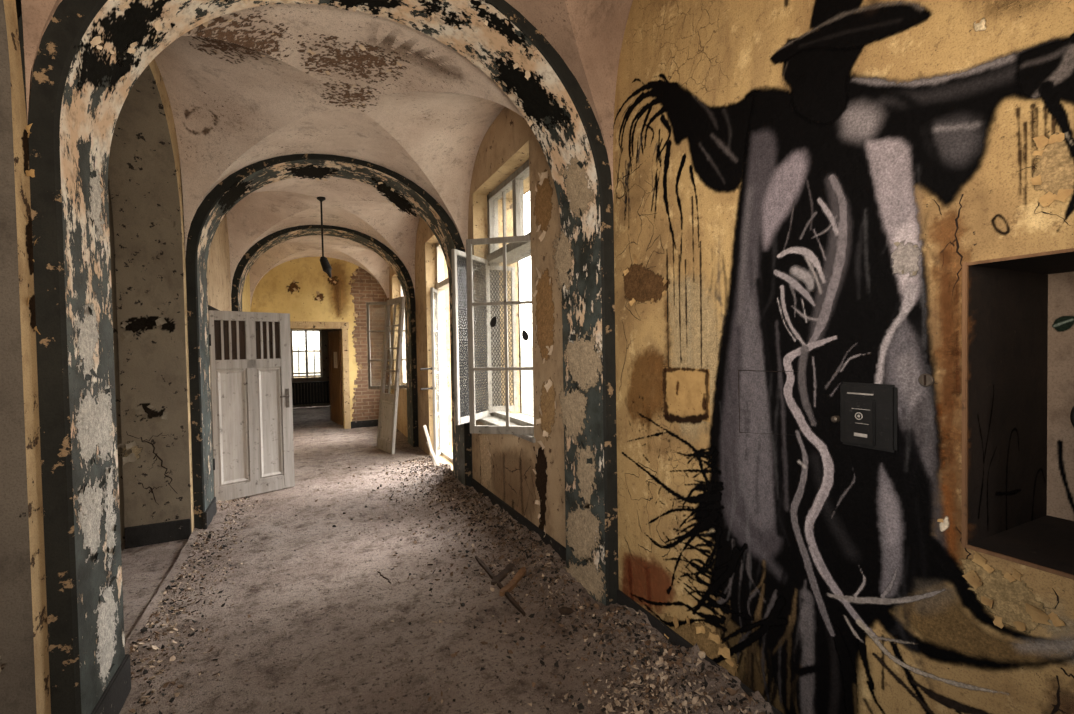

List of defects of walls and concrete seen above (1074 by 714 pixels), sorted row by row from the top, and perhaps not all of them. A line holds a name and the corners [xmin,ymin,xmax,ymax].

peeling [73,0,410,112]
peeling [418,0,572,132]
spalling [21,123,35,177]
peeling [86,164,107,239]
peeling [281,164,339,181]
peeling [368,178,417,219]
spalling [25,217,37,275]
flaking render [328,267,391,421]
peeling [532,155,606,603]
peeling [74,303,143,692]
peeling [961,551,1066,633]
crack [1051,667,1074,714]